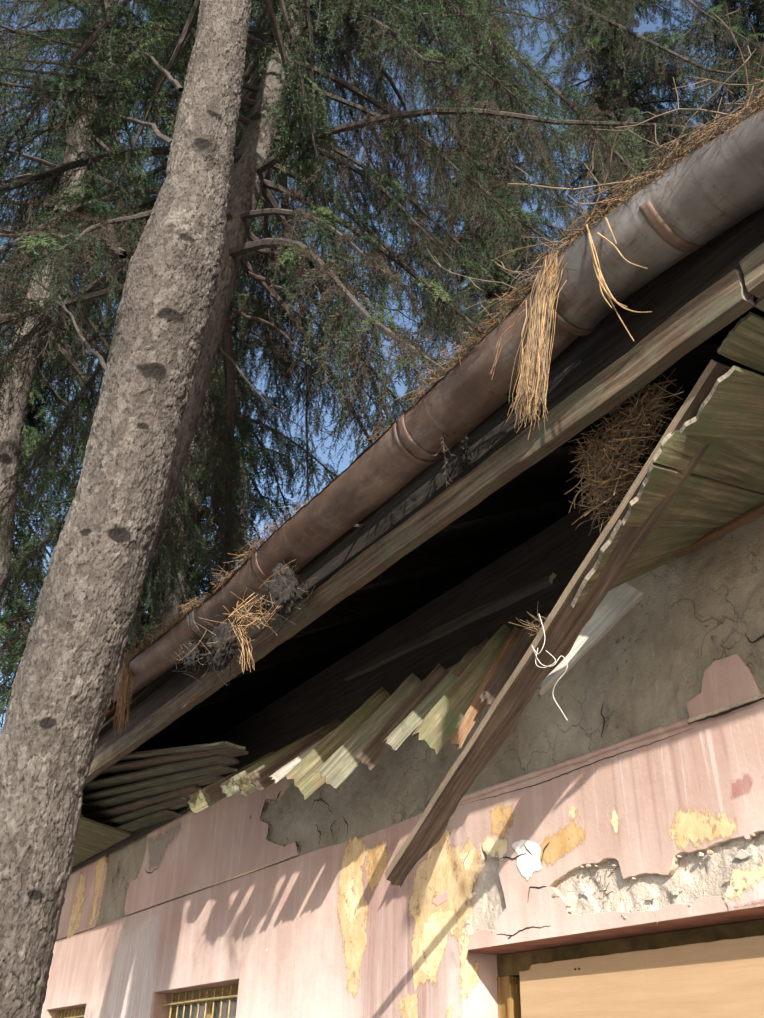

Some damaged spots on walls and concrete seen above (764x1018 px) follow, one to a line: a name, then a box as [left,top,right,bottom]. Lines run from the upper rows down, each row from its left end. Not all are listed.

spalling [465,514,764,795]
spalling [67,834,147,939]
spalling [250,705,491,998]
peeling [397,803,513,1018]
crack [497,926,548,939]
crack [500,842,550,861]
peeling [540,805,586,865]
spalling [552,807,764,919]